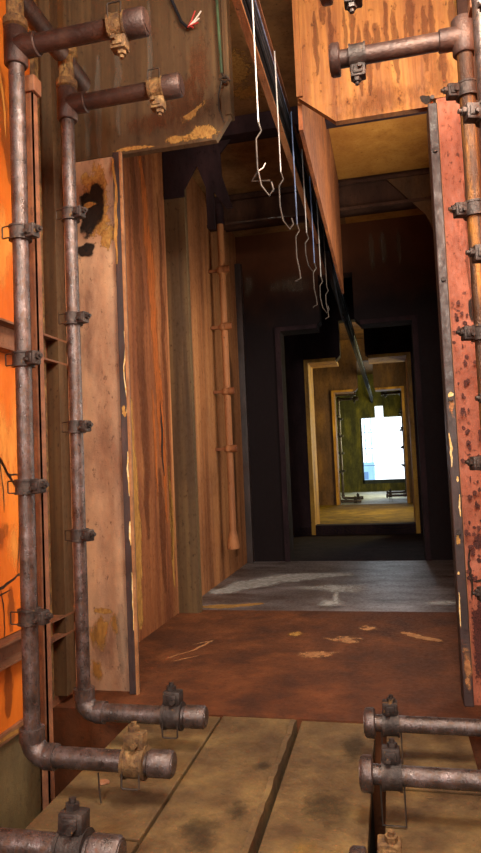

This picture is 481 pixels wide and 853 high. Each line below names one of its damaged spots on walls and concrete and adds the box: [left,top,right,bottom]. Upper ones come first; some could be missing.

peeling [166,101,220,144]
peeling [78,145,155,264]